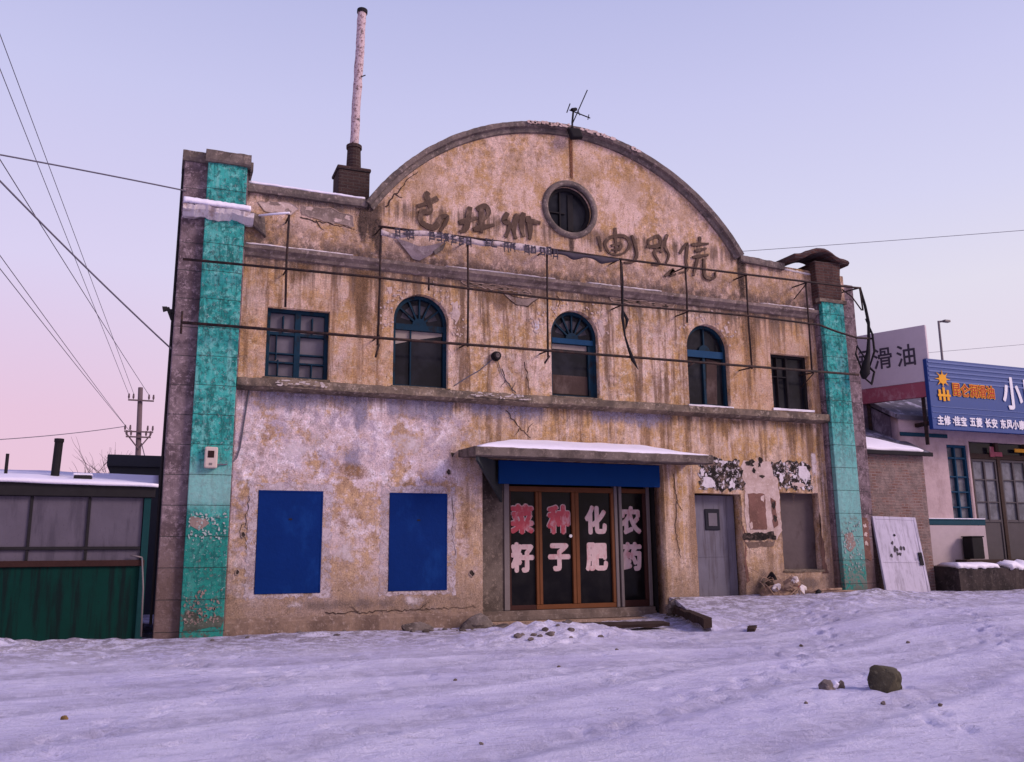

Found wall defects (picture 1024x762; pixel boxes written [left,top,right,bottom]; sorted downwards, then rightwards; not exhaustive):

crack [385,172,418,207]
flaking render [258,201,354,227]
damp [354,271,383,339]
crack [501,362,533,436]
peeling [188,512,227,541]
peeling [697,456,813,583]
peeling [183,589,223,631]
crack [325,601,478,614]